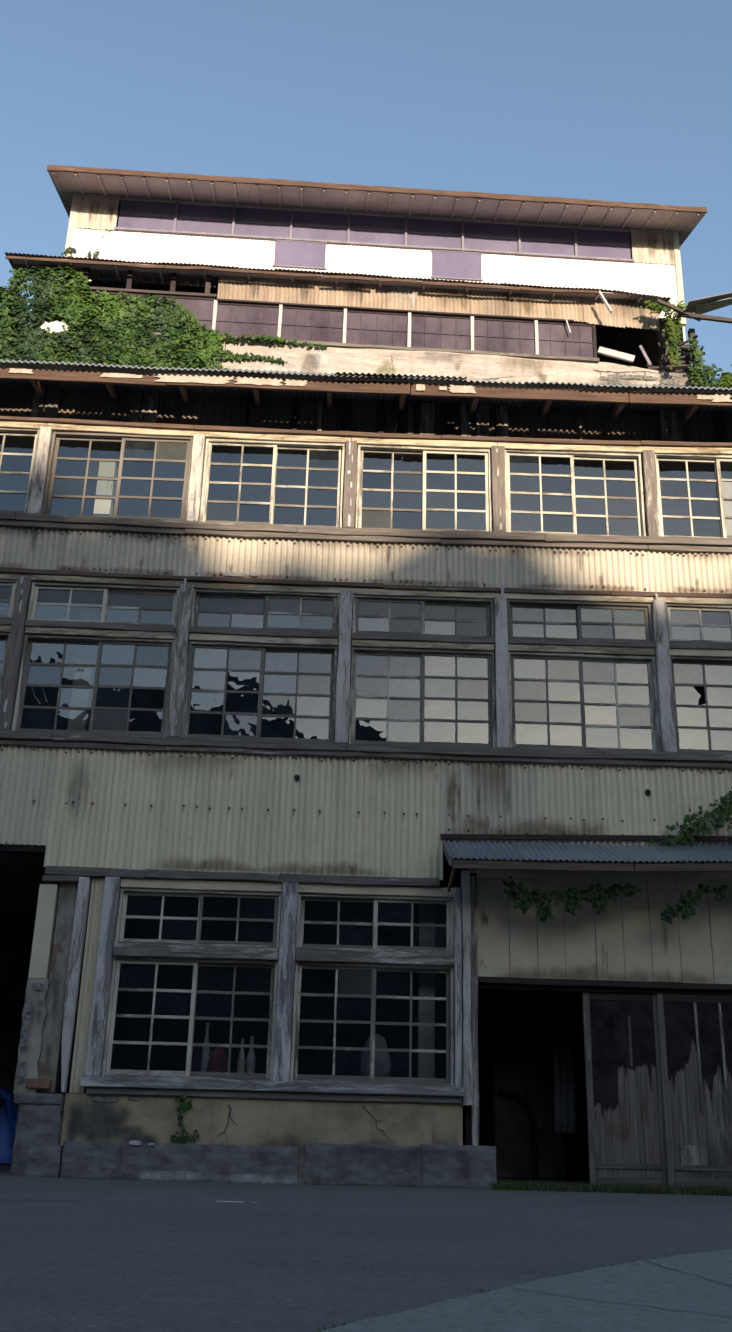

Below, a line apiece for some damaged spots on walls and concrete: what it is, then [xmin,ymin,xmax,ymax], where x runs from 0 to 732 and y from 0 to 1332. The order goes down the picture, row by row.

crack [594,369,680,386]
peeling [590,1000,732,1117]
leakage [68,1102,156,1143]
crack [217,1105,238,1142]